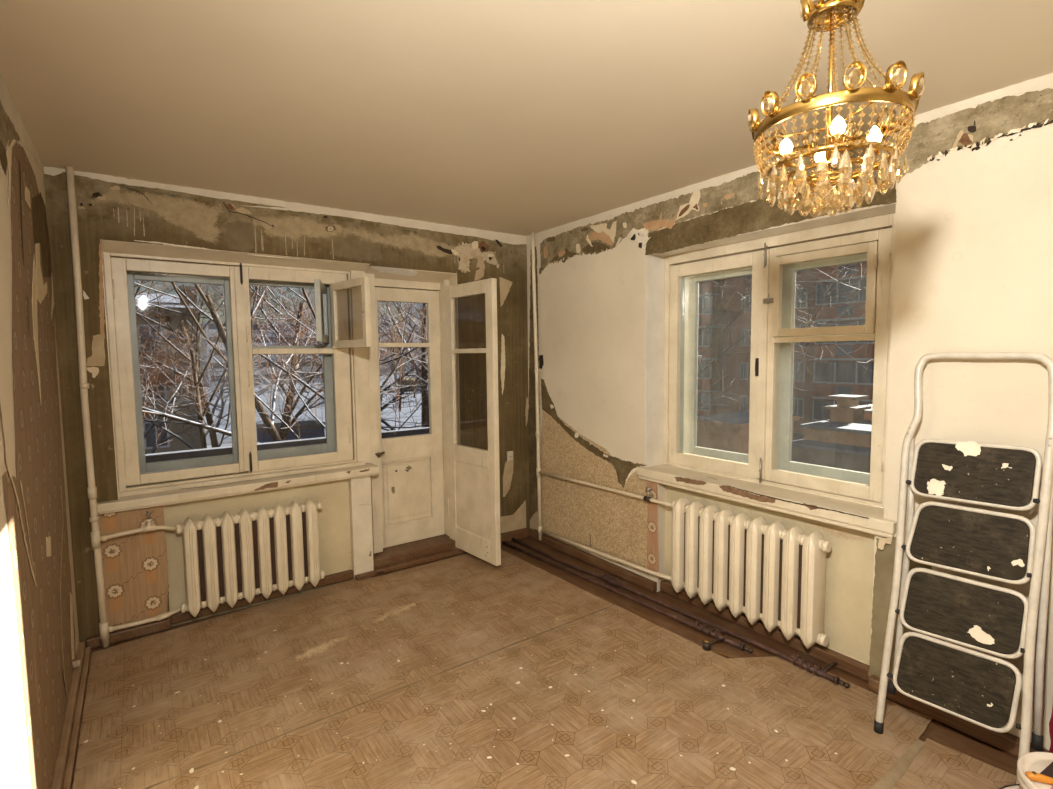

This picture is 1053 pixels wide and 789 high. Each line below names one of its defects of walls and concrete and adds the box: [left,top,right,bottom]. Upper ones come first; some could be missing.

flaking render [0,100,20,174]
spalling [539,88,1053,274]
flaking render [32,192,52,278]
peeling [78,186,502,281]